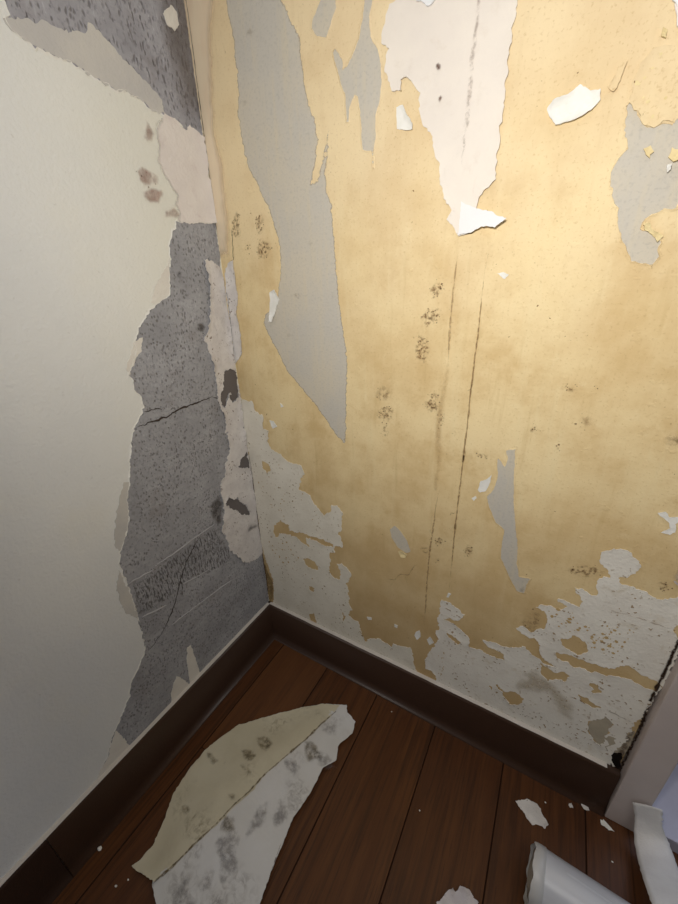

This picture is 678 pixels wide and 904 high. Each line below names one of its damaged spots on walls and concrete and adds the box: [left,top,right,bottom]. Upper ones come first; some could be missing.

flaking render [2,0,203,136]
peeling [227,0,347,443]
peeling [310,0,384,170]
peeling [396,105,413,130]
peeling [608,101,678,270]
crack [138,397,220,427]
flaking render [97,220,269,778]
peeling [472,447,532,594]
peeling [658,512,678,535]
leakage [615,640,678,772]